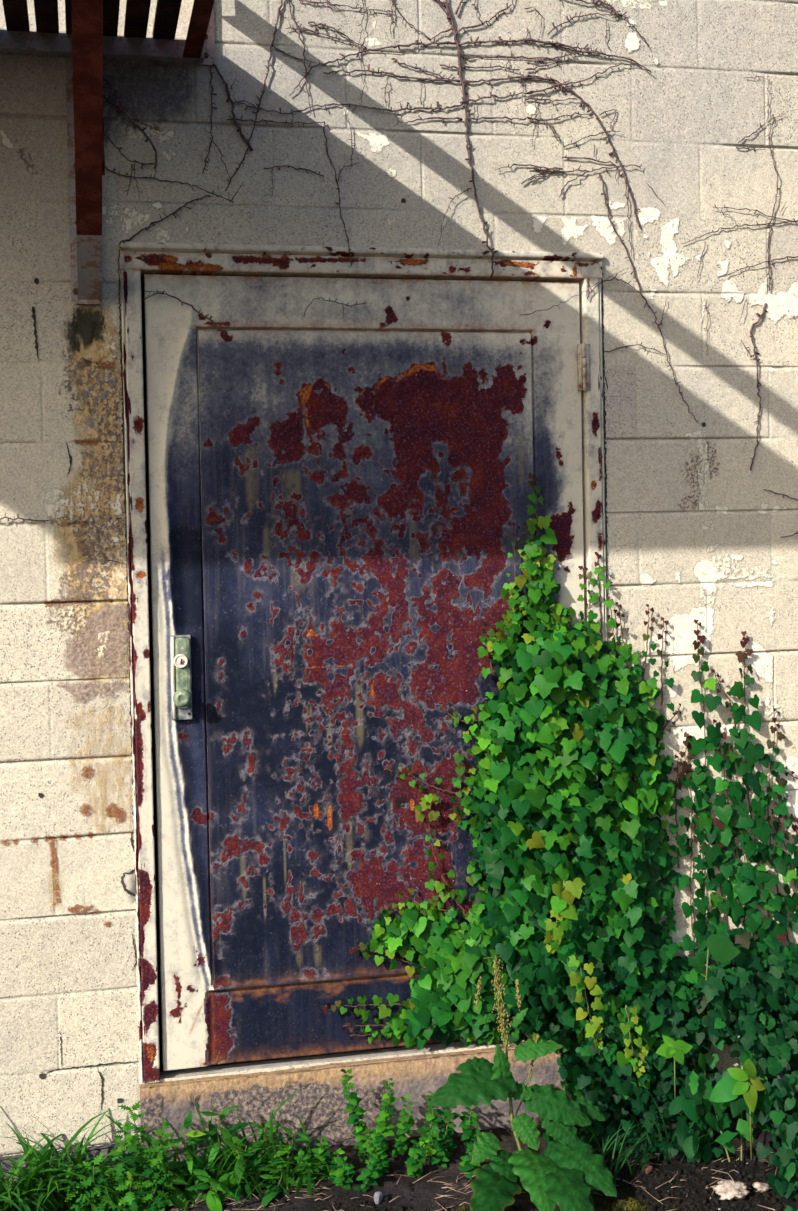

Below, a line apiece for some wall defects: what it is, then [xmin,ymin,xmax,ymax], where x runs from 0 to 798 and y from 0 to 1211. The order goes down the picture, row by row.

peeling [532,201,703,299]
peeling [716,240,798,324]
water stain [64,321,104,352]
peeling [639,573,656,587]
peeling [644,423,777,698]
water stain [60,603,129,703]
peeling [745,637,783,719]
corrosion [105,803,125,823]
corrosion [1,832,110,927]